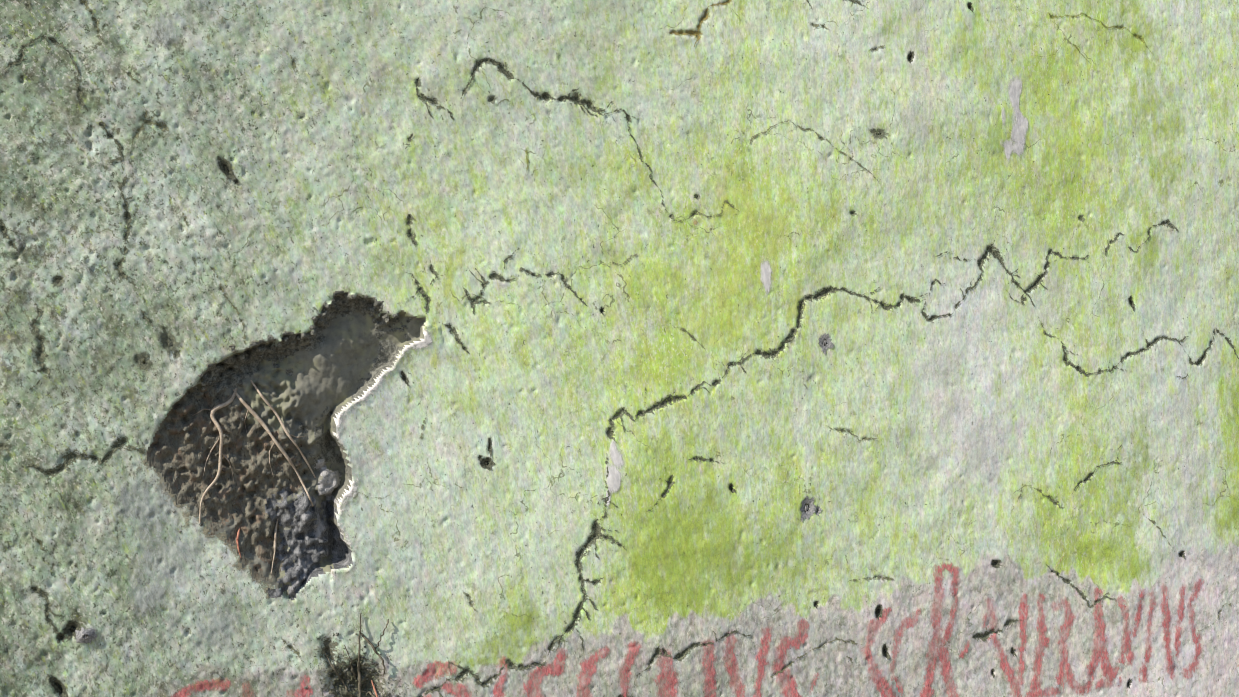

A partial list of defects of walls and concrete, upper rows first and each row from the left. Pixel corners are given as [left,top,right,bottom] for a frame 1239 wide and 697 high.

crack [405,58,739,222]
crack [669,0,731,47]
spalling [122,289,432,612]
crack [406,214,1239,697]